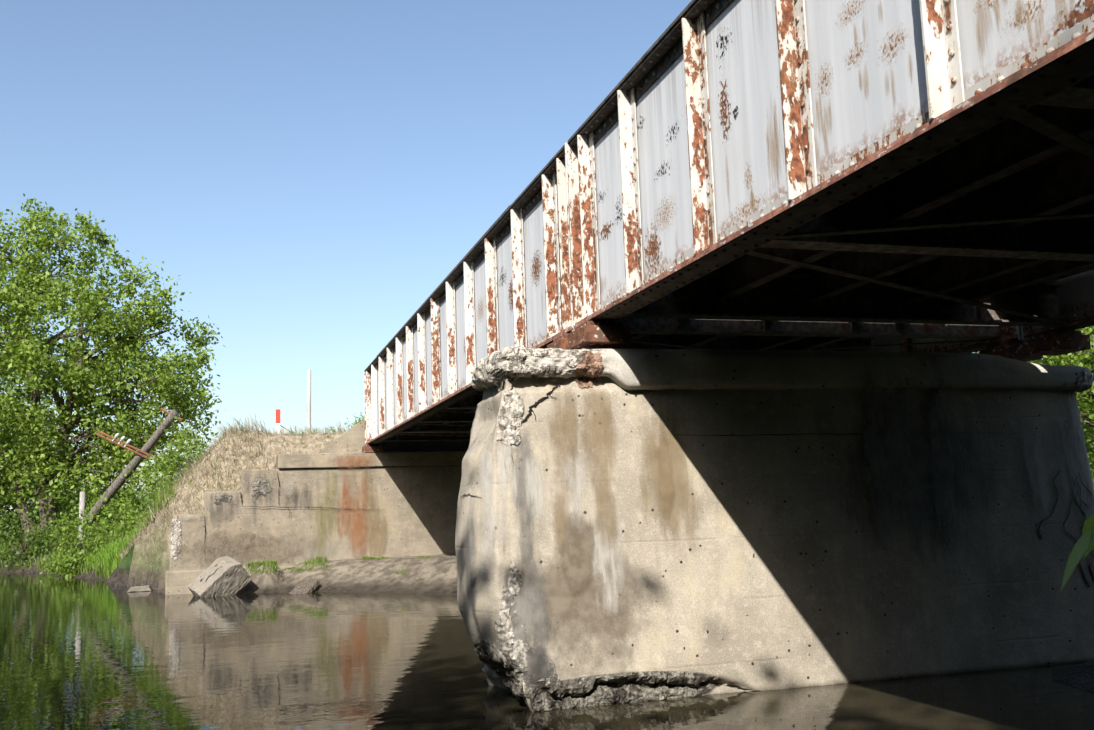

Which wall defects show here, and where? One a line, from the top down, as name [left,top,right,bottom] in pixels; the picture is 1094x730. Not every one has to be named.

spalling [380,262,605,445]
leakage [483,445,542,550]
leakage [591,398,612,465]
leakage [506,500,634,686]
spalling [473,561,719,711]